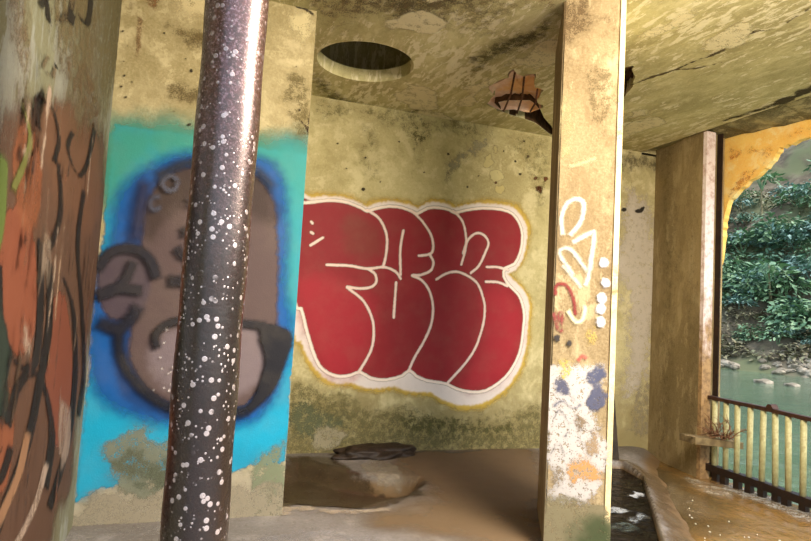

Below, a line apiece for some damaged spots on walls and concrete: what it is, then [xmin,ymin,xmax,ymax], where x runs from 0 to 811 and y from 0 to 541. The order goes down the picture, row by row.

damp [174,0,205,16]
damp [288,0,512,42]
peeling [386,0,446,34]
damp [55,0,122,121]
damp [170,85,198,103]
damp [286,74,308,134]
damp [316,81,354,116]
spalling [456,40,558,134]
damp [470,21,548,71]
spalling [624,66,633,96]